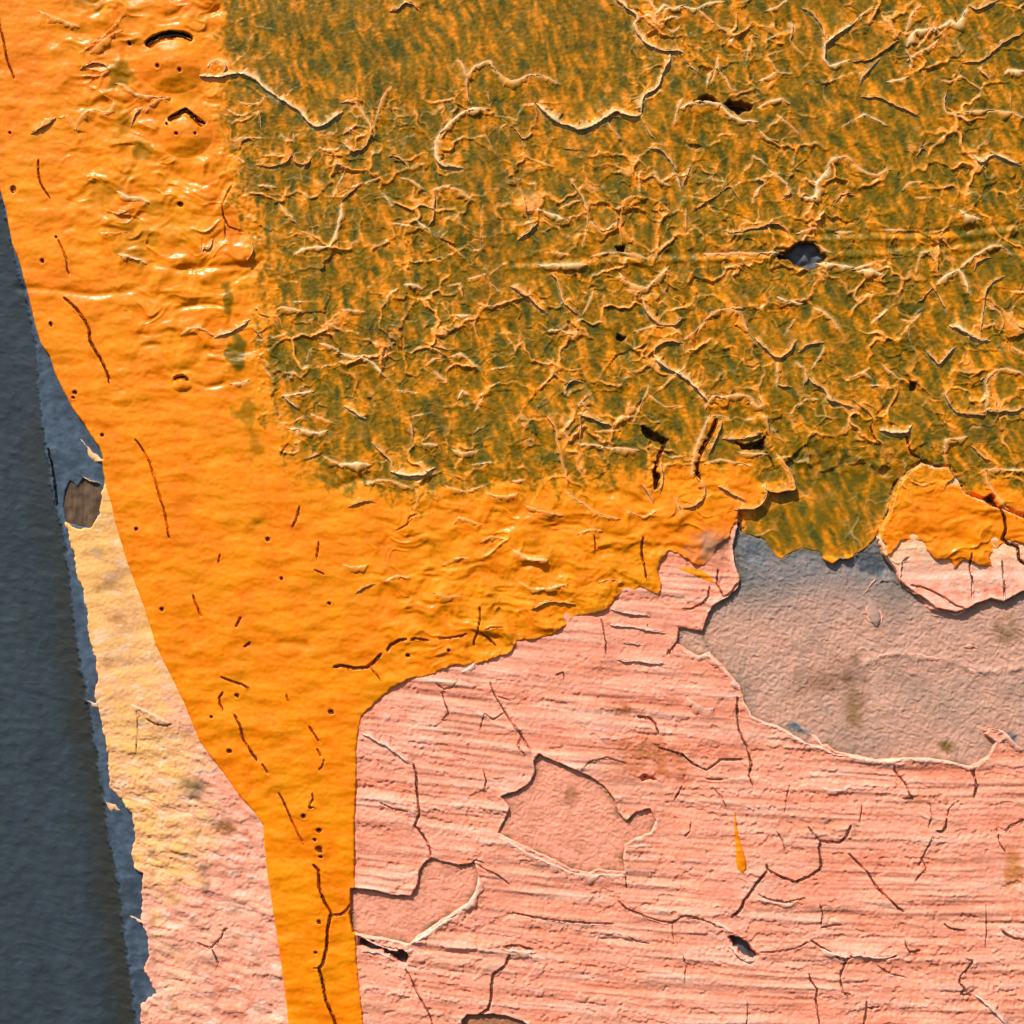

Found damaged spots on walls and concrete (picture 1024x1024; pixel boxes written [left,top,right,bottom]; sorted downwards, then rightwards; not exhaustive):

crack [695,418,718,483]
spalling [64,479,102,527]
crack [333,608,503,679]
spalling [676,462,1024,771]
crack [638,699,753,808]
spalling [498,754,655,886]
crack [280,726,351,1024]
spalling [350,858,484,962]
spalling [462,1014,526,1024]
crack [479,945,534,1015]
crack [514,785,921,1024]
spalling [729,935,756,962]